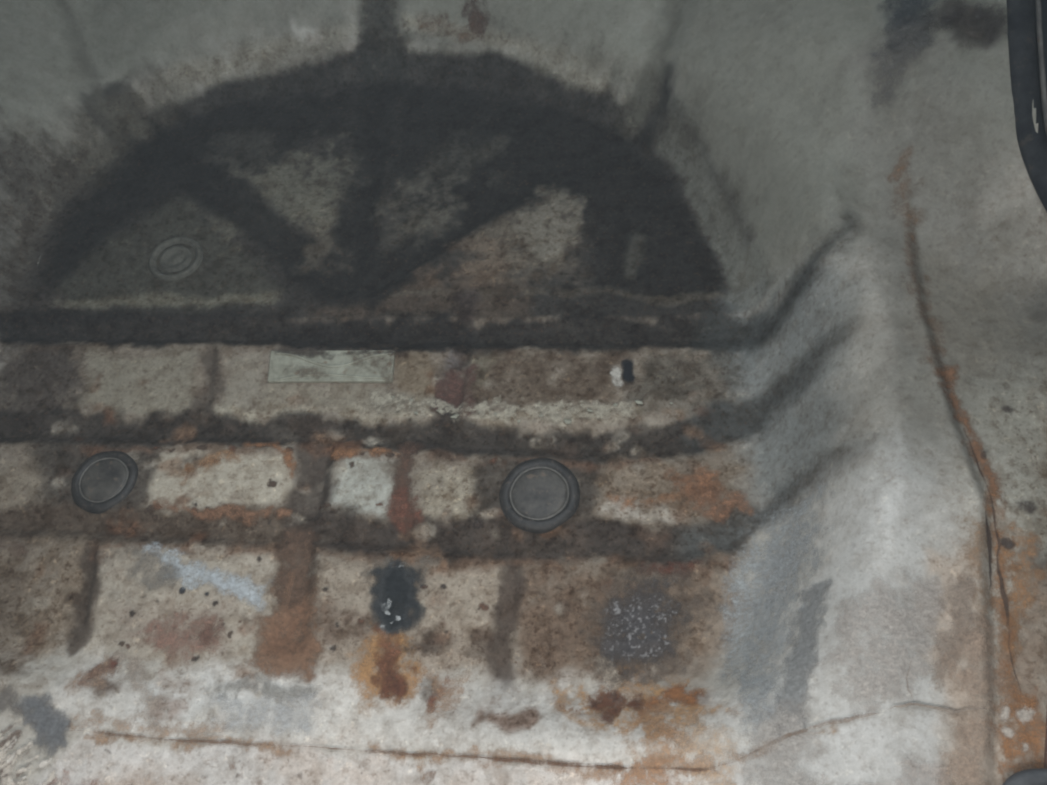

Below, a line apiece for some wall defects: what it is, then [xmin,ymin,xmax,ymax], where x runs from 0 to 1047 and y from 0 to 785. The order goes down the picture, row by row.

corrosion [153,501,291,525]
corrosion [251,529,322,682]
corrosion [888,149,1046,779]
crack [964,431,1021,690]
crack [98,732,261,746]
corrosion [351,626,463,725]
crack [292,662,1003,773]